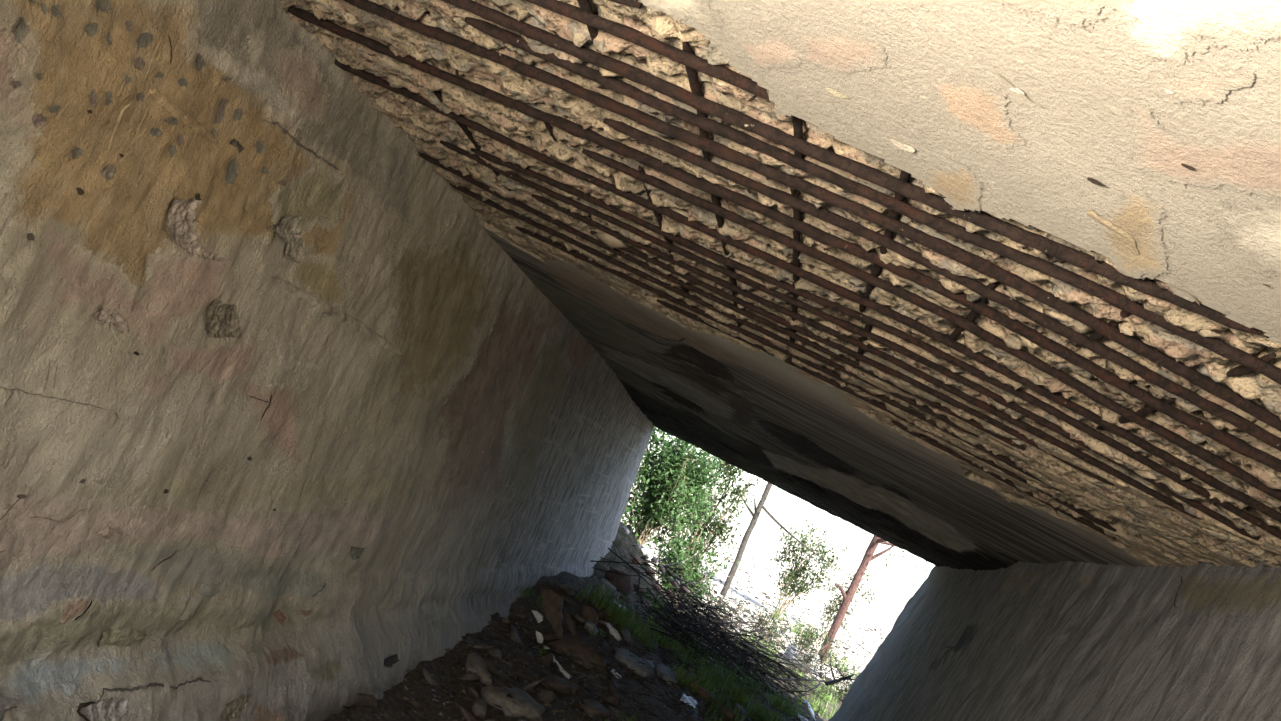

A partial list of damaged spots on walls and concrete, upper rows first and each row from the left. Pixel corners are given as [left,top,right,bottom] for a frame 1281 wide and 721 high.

spalling [165,193,224,261]
spalling [266,215,306,263]
spalling [280,0,1281,568]
spalling [205,299,241,338]
leakage [0,0,761,721]
crack [0,361,119,420]
crack [0,706,18,721]
crack [77,677,213,721]